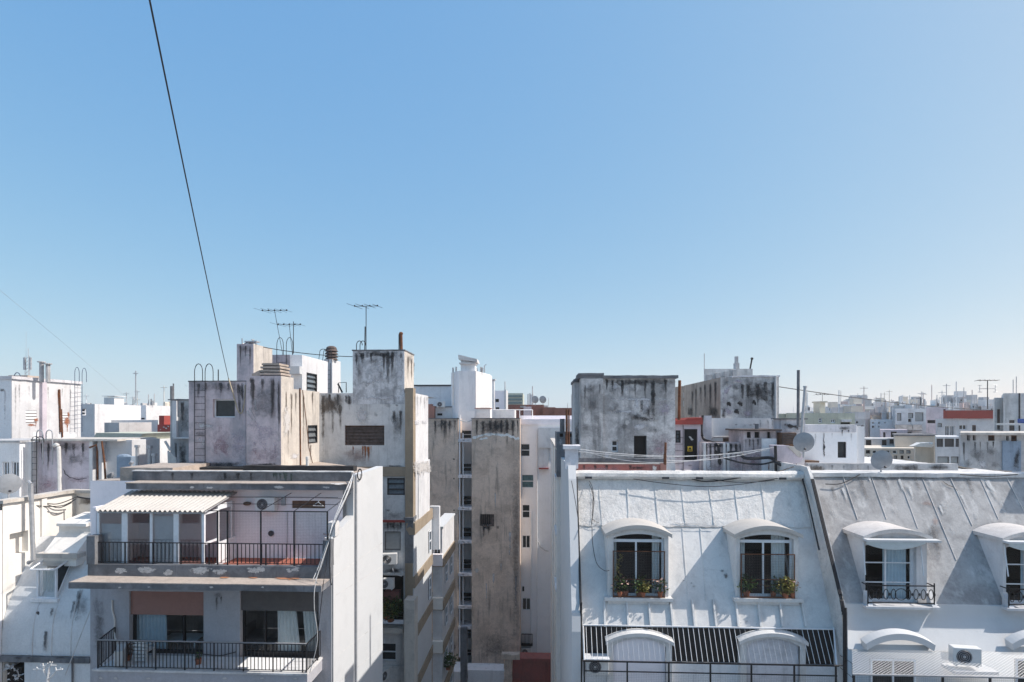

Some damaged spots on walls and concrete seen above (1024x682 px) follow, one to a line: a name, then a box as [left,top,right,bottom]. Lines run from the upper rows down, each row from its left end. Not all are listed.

damp [355,352,415,377]
damp [237,378,350,435]
damp [599,379,667,421]
damp [741,383,774,404]
damp [476,420,518,441]